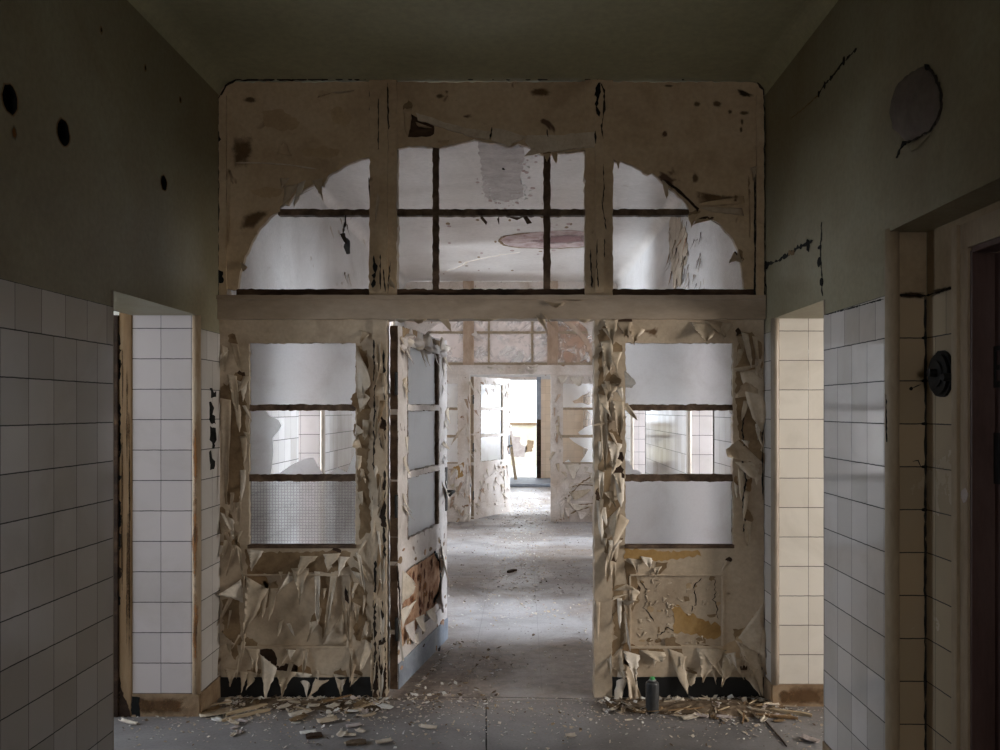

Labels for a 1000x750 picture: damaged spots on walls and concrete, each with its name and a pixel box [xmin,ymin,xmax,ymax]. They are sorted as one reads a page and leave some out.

crack [791,48,857,118]
peeling [227,109,340,244]
crack [218,79,359,295]
peeling [330,215,350,254]
peeling [476,142,558,209]
crack [754,82,883,315]
peeling [199,319,501,737]
peeling [442,380,534,522]
peeling [549,319,803,723]